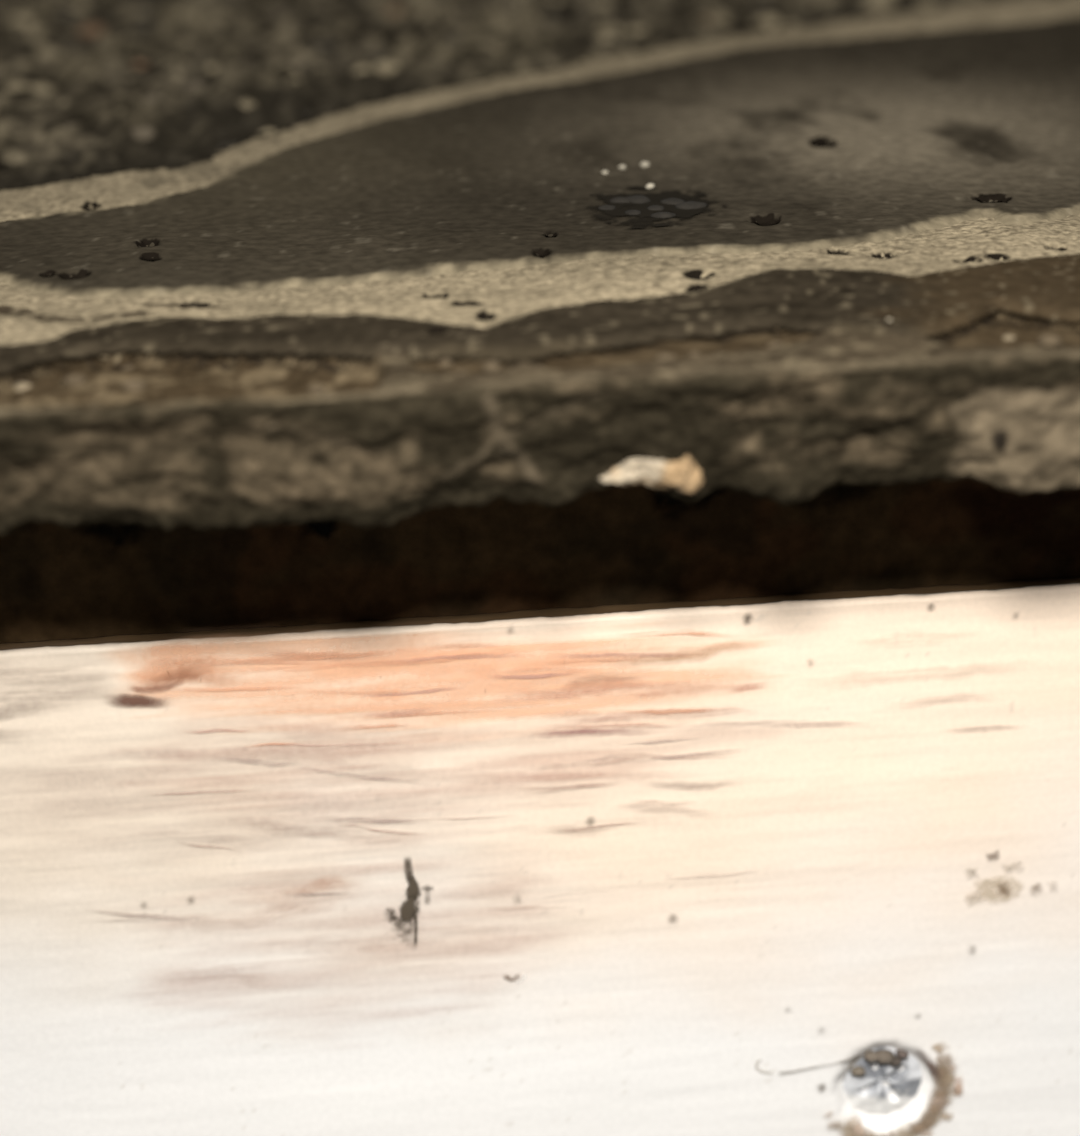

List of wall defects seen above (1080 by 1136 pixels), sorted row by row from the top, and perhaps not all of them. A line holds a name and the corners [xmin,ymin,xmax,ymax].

spalling [954,253,1009,263]
spalling [683,270,715,292]
spalling [422,293,495,321]
spalling [427,324,449,335]
spalling [927,308,1080,348]
spalling [409,328,823,374]
spalling [0,351,385,408]
corrosion [116,639,690,716]